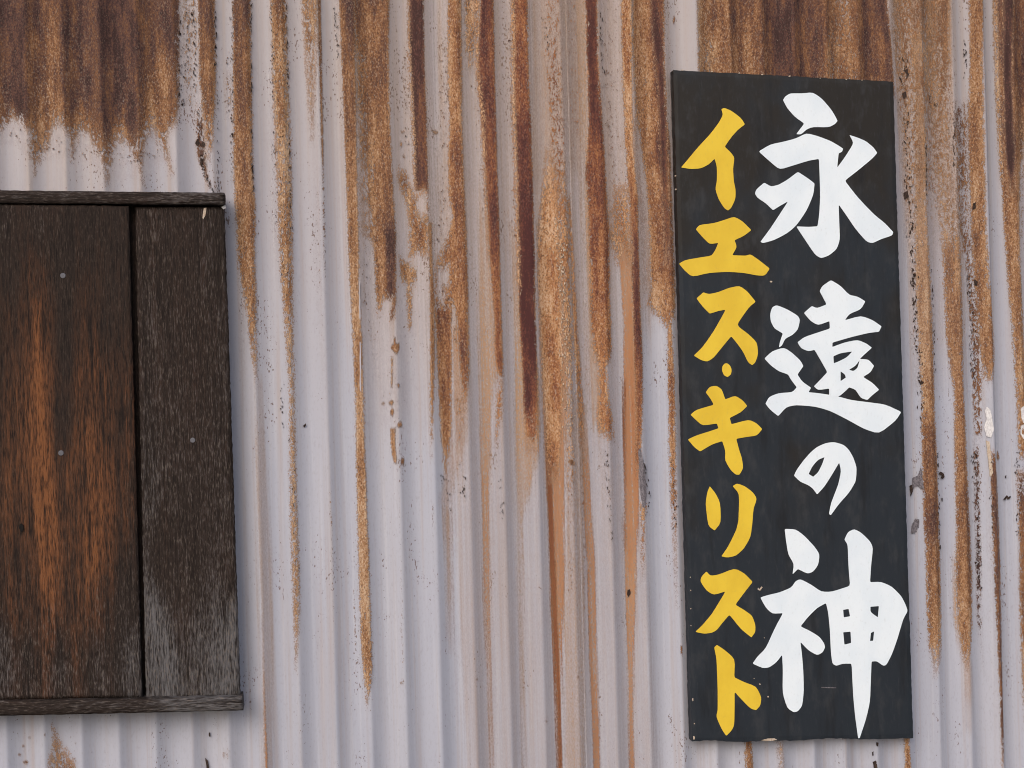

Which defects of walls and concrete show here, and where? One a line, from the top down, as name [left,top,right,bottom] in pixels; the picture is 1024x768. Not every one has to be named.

corrosion [0,0,260,373]
corrosion [269,0,677,768]
corrosion [696,0,895,95]
corrosion [906,0,1024,766]